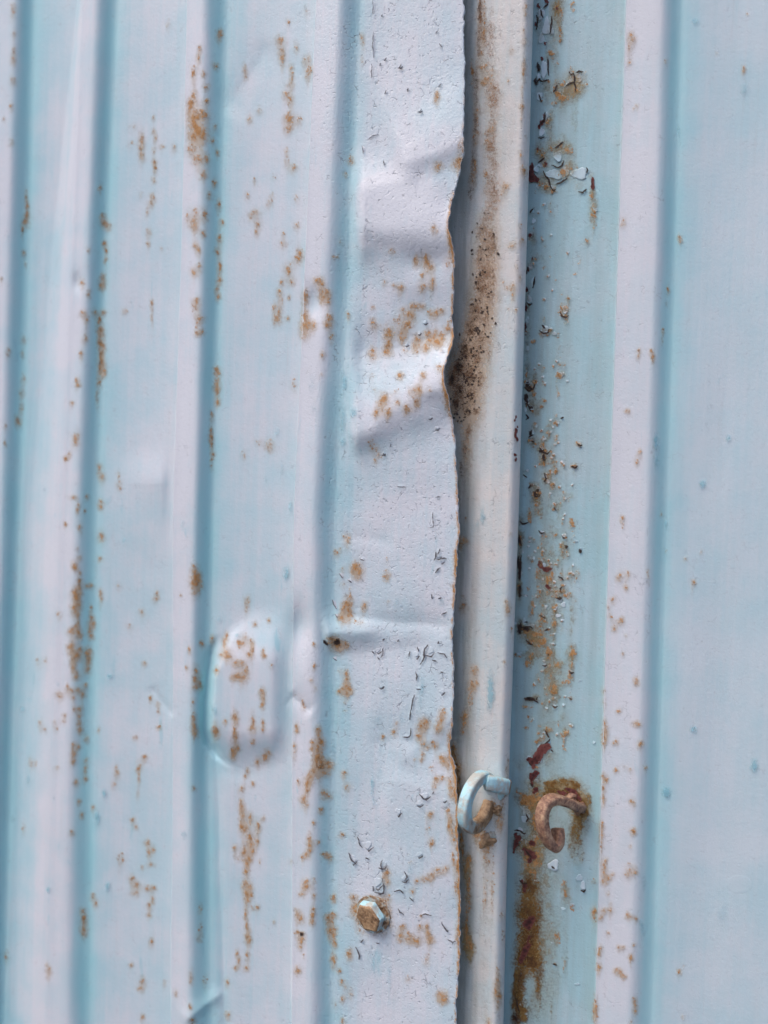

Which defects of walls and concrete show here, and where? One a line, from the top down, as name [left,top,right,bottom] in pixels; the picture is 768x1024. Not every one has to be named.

rust [188,71,221,205]
peeling [529,0,598,228]
rust [301,278,333,338]
rust [370,0,508,637]
rust [59,563,102,732]
rust [188,634,272,682]
rust [213,715,239,758]
rust [233,751,269,969]
rust [297,728,332,811]
rust [540,768,617,861]